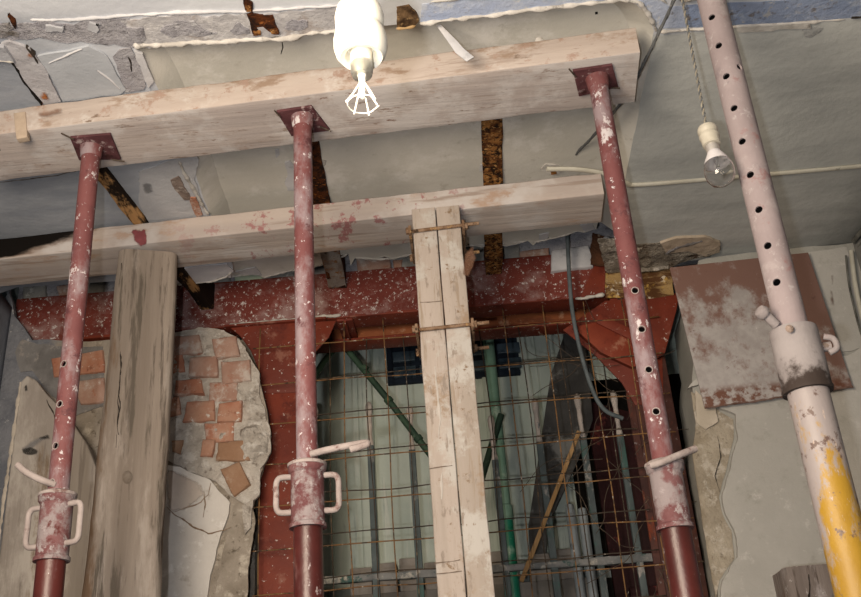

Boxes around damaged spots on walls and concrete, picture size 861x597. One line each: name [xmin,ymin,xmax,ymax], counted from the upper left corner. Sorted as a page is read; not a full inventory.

rust [0,39,61,105]
spalling [0,4,338,93]
hole [396,4,419,30]
peeling [437,24,474,62]
flaking render [190,197,203,217]
spalling [213,266,295,283]
spalling [341,254,415,272]
spalling [462,244,485,262]
spalling [502,223,624,298]
spalling [637,235,721,299]
flaking render [168,327,272,597]
flaking render [691,390,735,597]